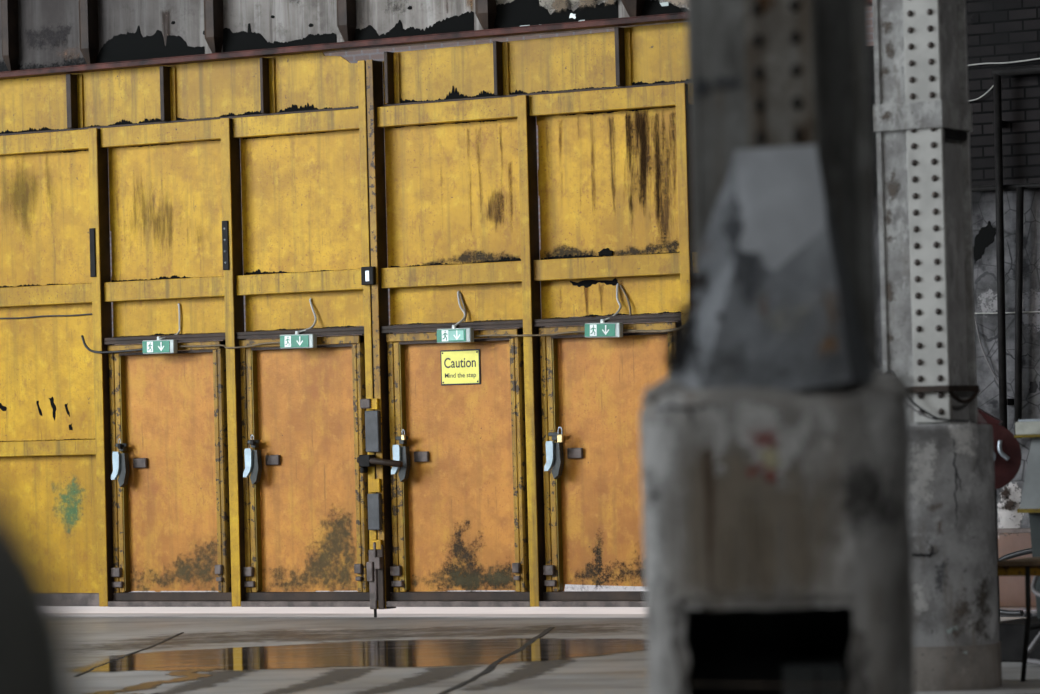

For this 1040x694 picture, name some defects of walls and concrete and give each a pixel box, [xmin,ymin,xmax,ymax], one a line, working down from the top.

peeling [493,0,618,29]
peeling [640,417,683,592]
peeling [706,400,838,479]
peeling [865,398,939,508]
crack [953,439,962,528]
crack [912,545,938,557]
crack [78,632,214,694]
crack [438,627,555,694]